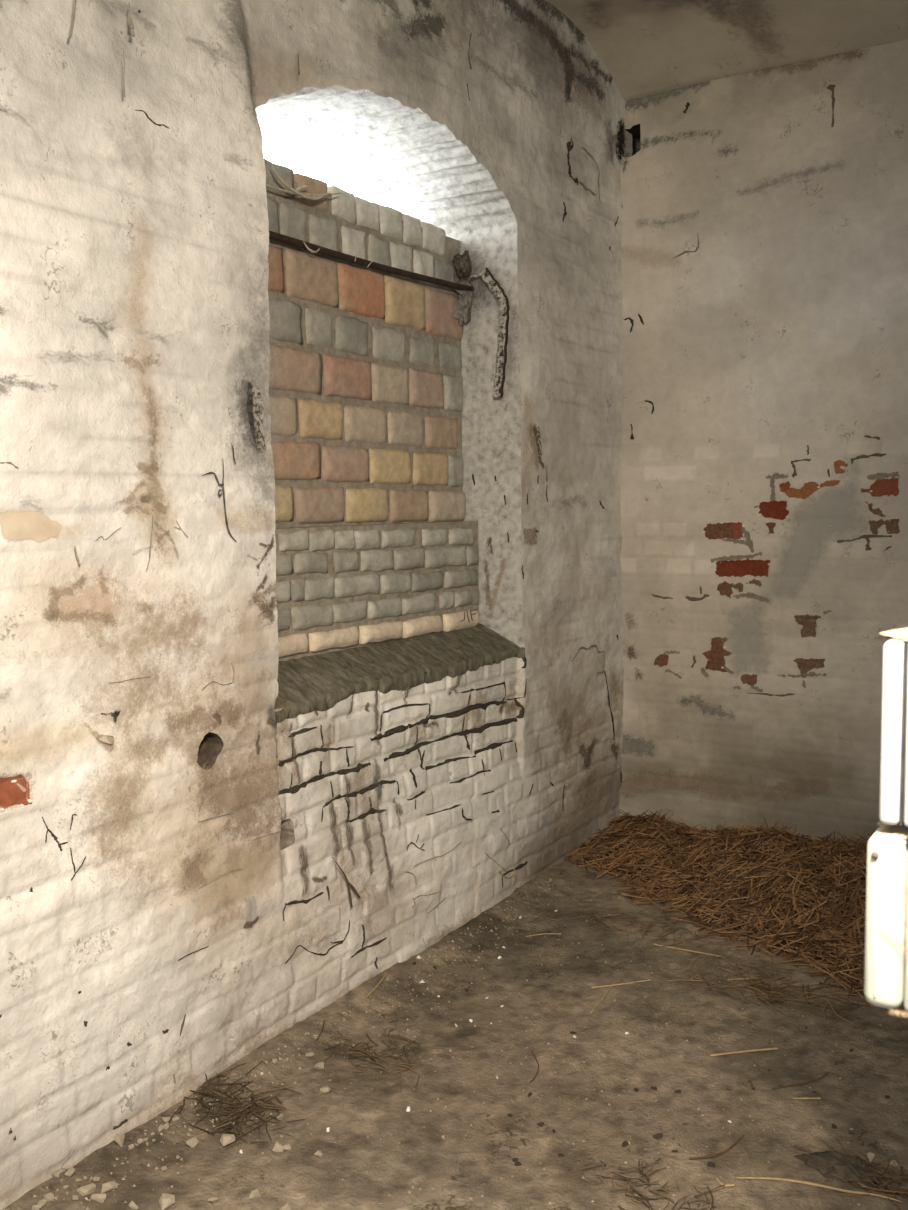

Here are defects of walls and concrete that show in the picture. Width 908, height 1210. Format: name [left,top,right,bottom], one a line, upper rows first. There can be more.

damp [374,0,446,41]
spalling [754,460,848,534]
spalling [861,471,900,534]
damp [45,572,118,627]
damp [247,537,278,623]
spalling [702,522,770,602]
spalling [701,637,763,692]
spalling [778,658,826,688]
damp [173,701,245,729]
damp [256,708,301,783]
spalling [0,773,33,811]
crack [407,828,510,914]